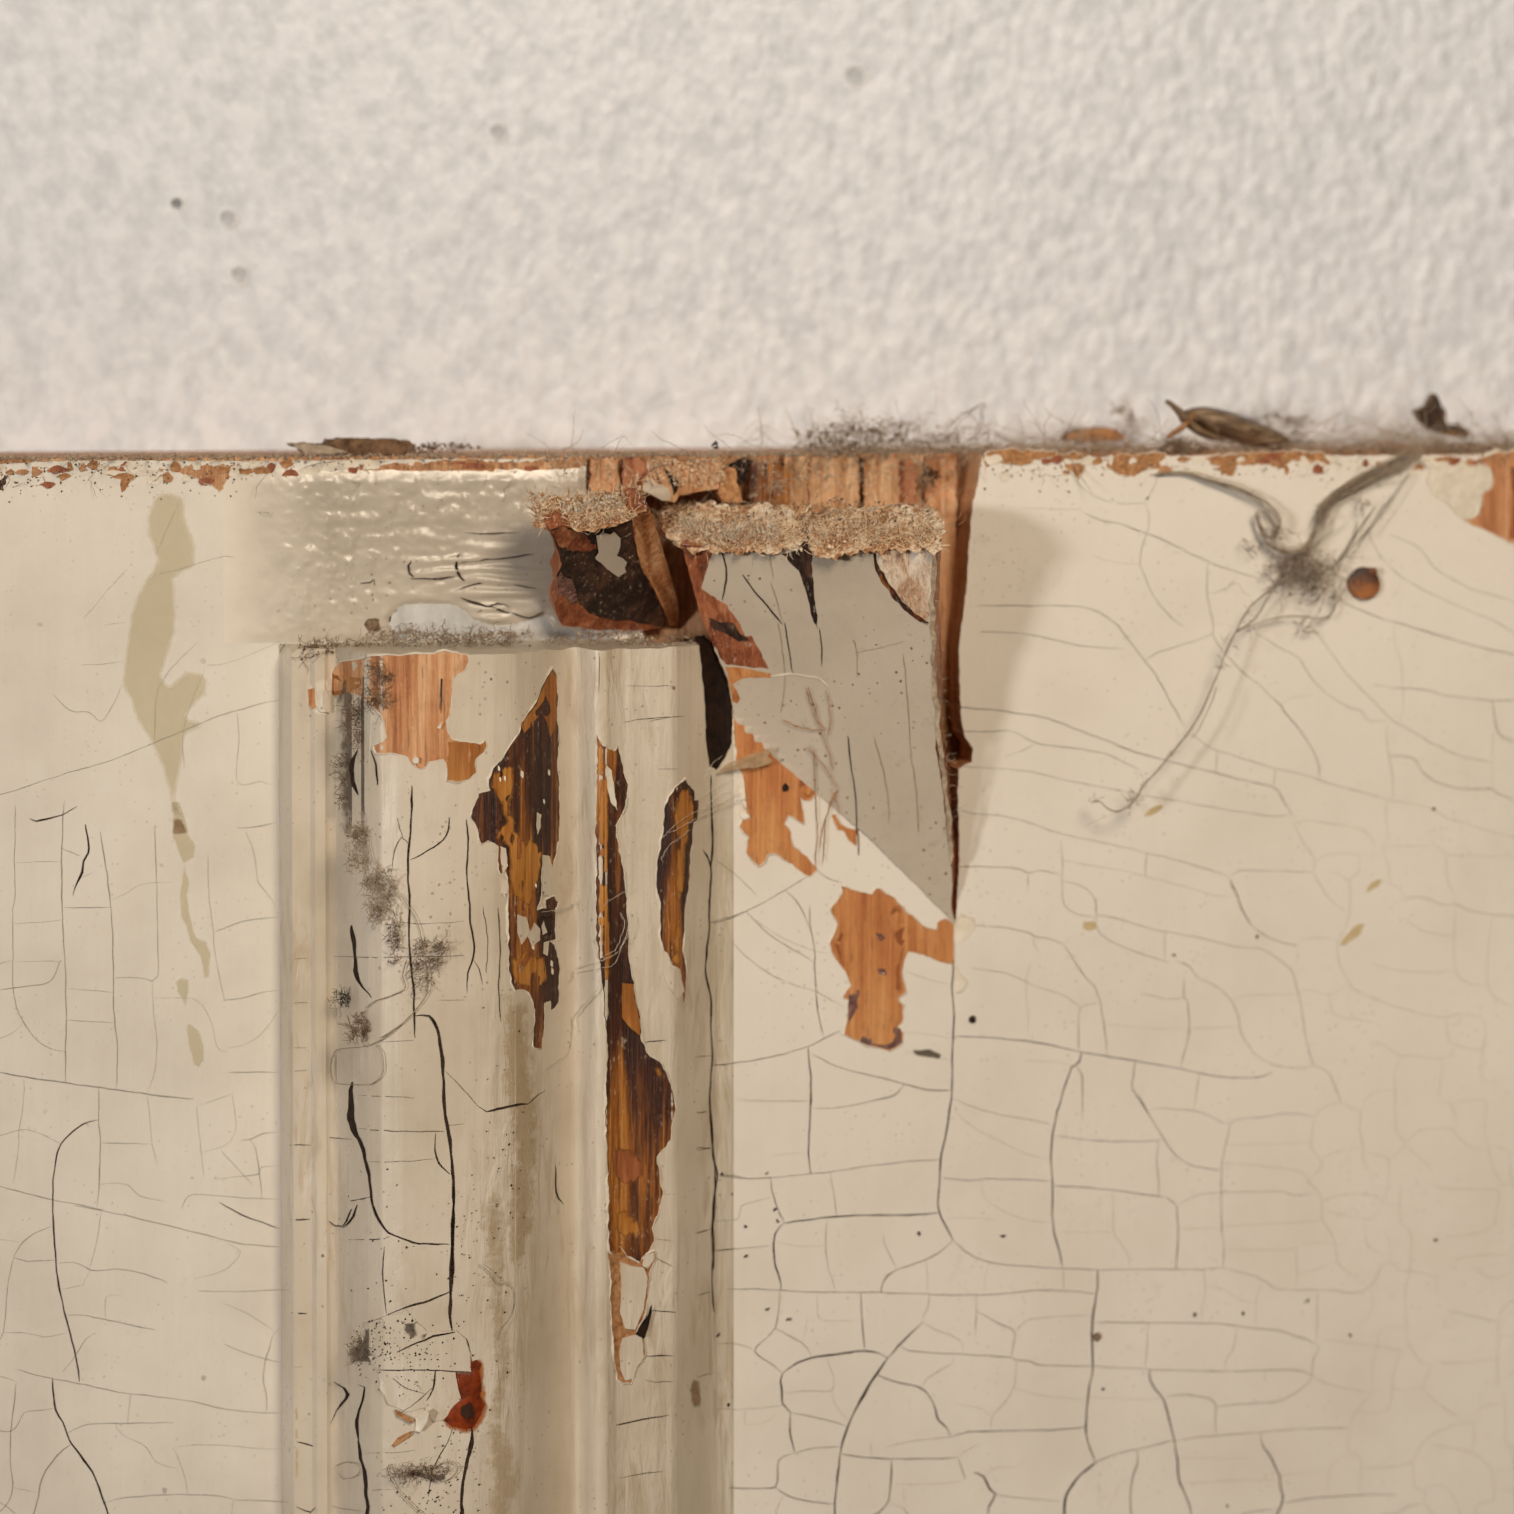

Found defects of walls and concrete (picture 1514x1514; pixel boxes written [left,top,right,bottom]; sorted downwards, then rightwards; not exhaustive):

peeling [983,448,1514,546]
leakage [173,820,185,833]
crack [0,643,545,1514]
peeling [306,602,614,1050]
peeling [592,735,677,1385]
peeling [655,777,700,1004]
peeling [732,714,820,877]
peeling [831,813,858,847]
peeling [828,885,977,1053]
crack [617,472,1514,1514]
crack [555,1165,563,1203]